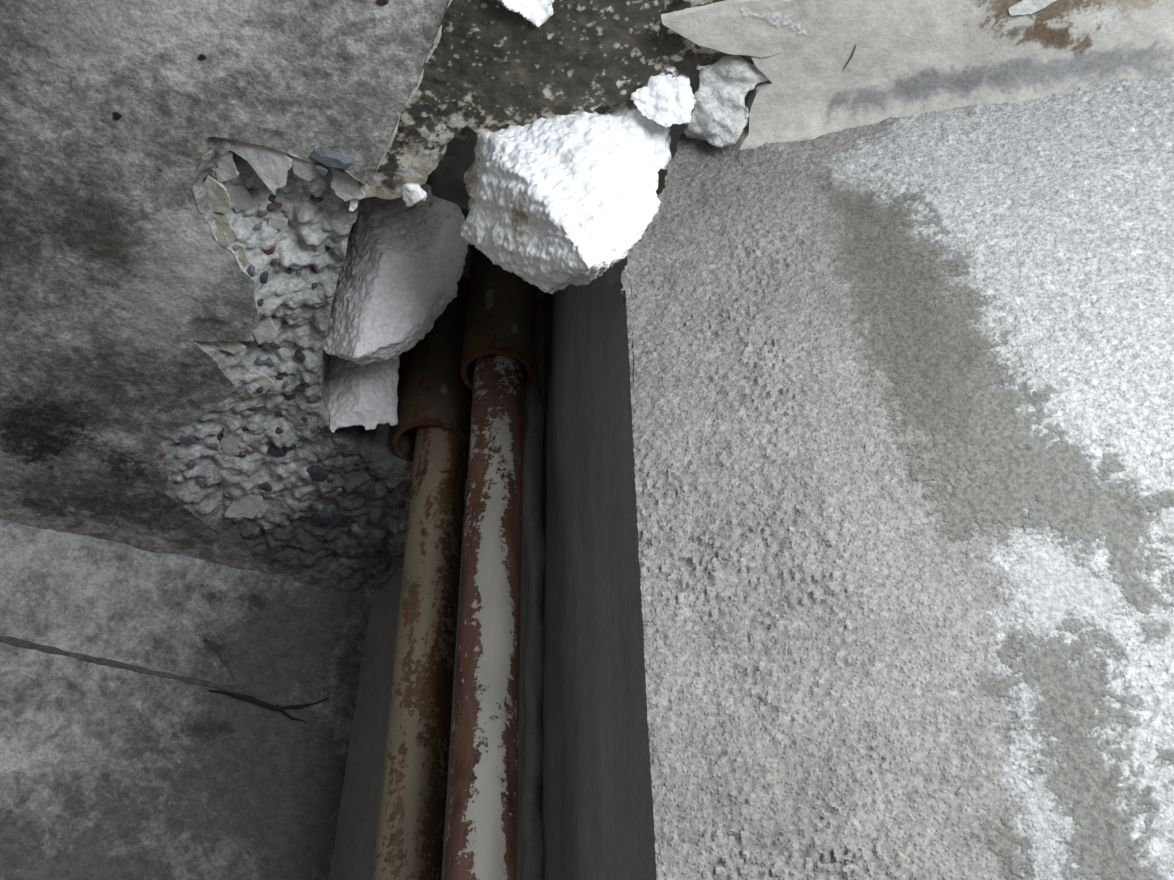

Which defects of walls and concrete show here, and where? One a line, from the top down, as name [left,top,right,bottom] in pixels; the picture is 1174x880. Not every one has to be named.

damp [14,0,158,67]
spalling [408,25,442,101]
spalling [498,0,554,27]
peeling [661,0,808,57]
spalling [376,115,400,171]
damp [129,252,200,352]
spalling [159,137,414,592]
damp [0,390,191,534]
damp [849,164,1174,880]
crack [0,636,329,722]